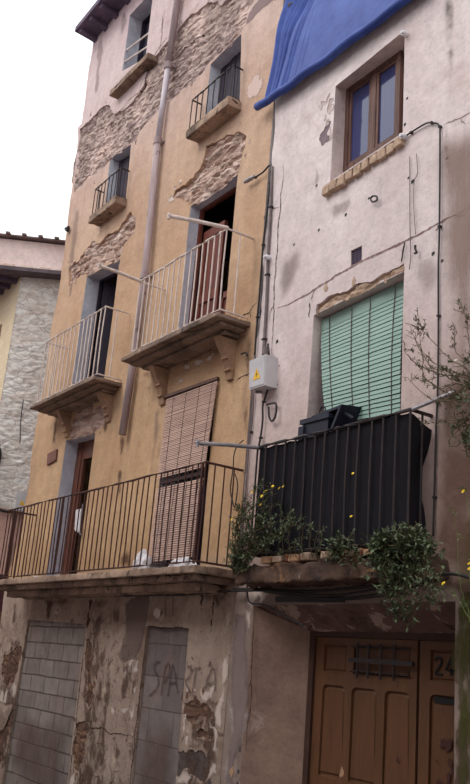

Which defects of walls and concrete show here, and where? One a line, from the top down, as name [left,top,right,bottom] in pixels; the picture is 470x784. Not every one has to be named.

flaking render [72,0,254,193]
flaking render [169,121,251,206]
peeling [318,93,335,146]
flaking render [68,212,136,288]
crack [241,166,452,350]
peeling [1,640,24,692]
peeling [72,638,97,780]
crack [69,626,188,784]
peeling [177,675,218,784]